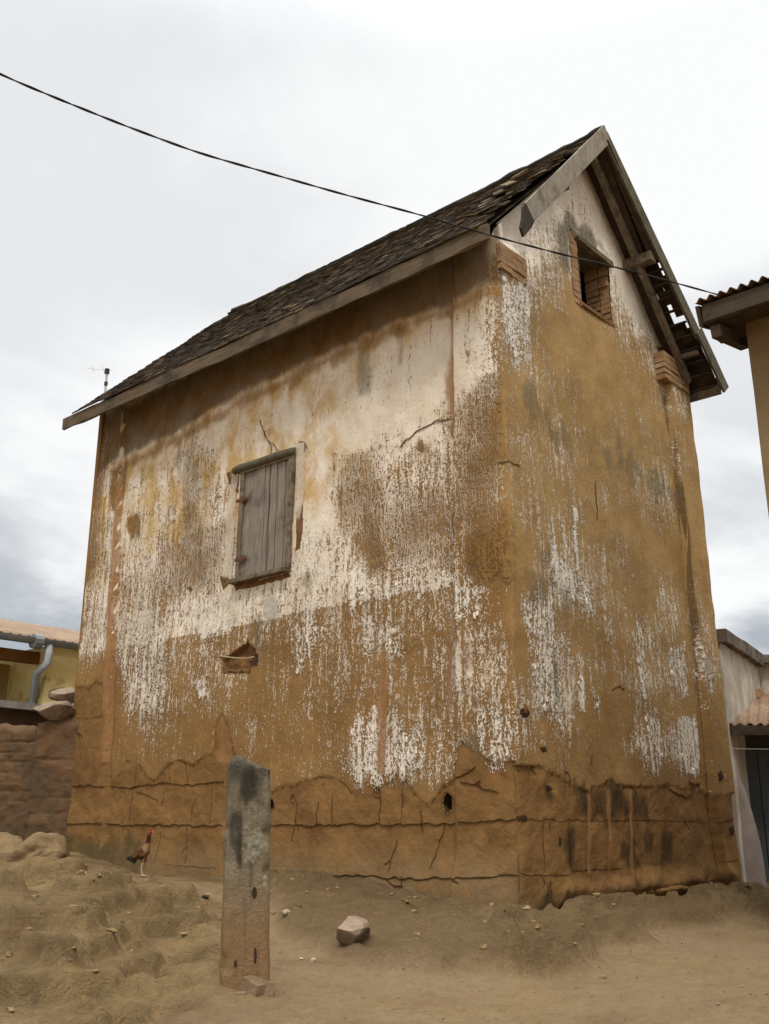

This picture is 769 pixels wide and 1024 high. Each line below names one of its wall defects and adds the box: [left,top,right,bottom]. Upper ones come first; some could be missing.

peeling [492,269,532,367]
crack [260,420,308,454]
crack [400,418,452,447]
peeling [88,454,122,581]
peeling [115,513,291,722]
peeling [291,603,334,677]
peeling [340,705,426,798]
peeling [325,434,601,773]
peeling [635,620,700,787]
peeling [668,638,716,701]
crack [67,762,223,869]
crack [278,780,736,899]